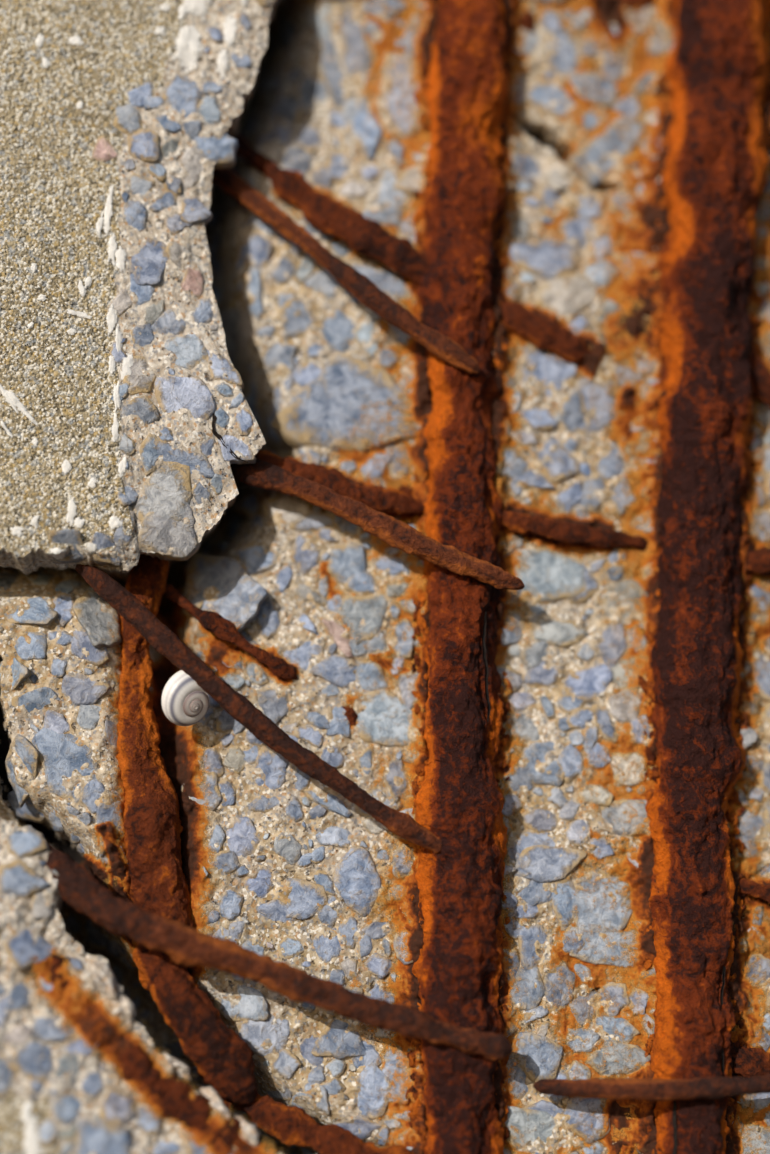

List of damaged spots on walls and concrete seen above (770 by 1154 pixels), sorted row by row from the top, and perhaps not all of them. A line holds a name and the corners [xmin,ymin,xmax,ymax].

peeling [172,25,203,74]
rust [283,318,433,536]
crack [0,702,90,871]
rust [151,655,217,935]
rust [314,531,430,820]
rust [491,0,675,1154]
rust [725,390,770,1077]
rust [23,948,276,1154]
spalling [195,968,427,1154]
spalling [419,1038,516,1154]
spalling [637,1093,770,1154]
spalling [743,905,770,1052]